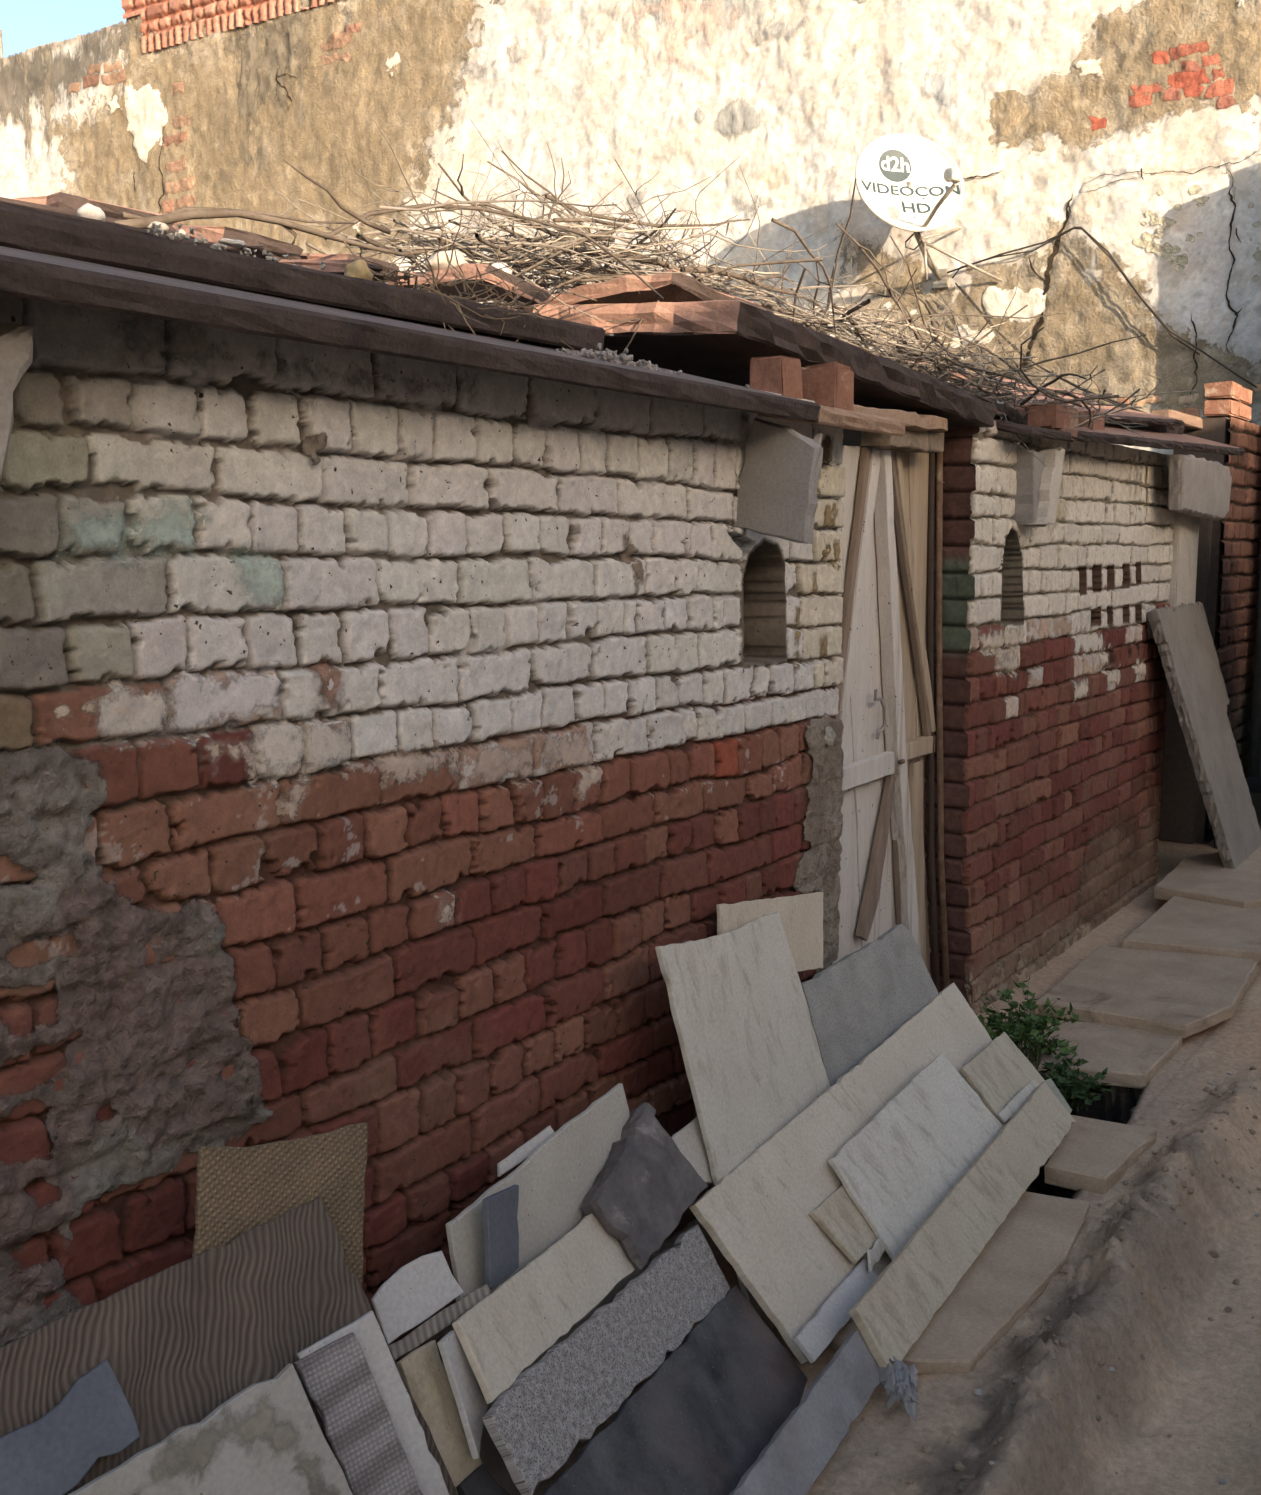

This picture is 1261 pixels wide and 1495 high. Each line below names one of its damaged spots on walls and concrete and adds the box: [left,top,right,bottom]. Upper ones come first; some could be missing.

flaking render [42,0,499,264]
crack [963,170,1003,179]
flaking render [834,185,1261,424]
flaking render [986,0,1261,154]
crack [1020,142,1261,395]
peeling [1219,163,1261,282]
peeling [372,728,603,801]
peeling [434,891,455,923]
flaking render [0,657,352,1347]